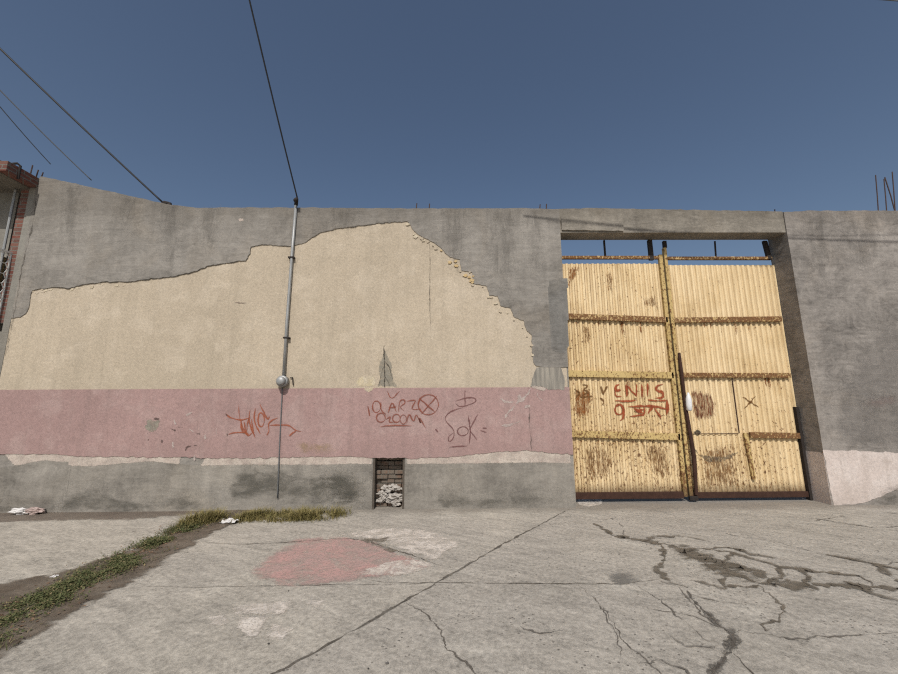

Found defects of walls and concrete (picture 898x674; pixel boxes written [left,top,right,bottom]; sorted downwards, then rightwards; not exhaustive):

flaking render [356,352,397,392]
peeling [531,367,565,391]
corrosion [573,381,592,416]
corrosion [692,379,716,419]
corrosion [580,440,612,480]
corrosion [635,441,672,478]
corrosion [704,445,779,491]
crack [578,518,898,674]
crack [408,604,476,674]